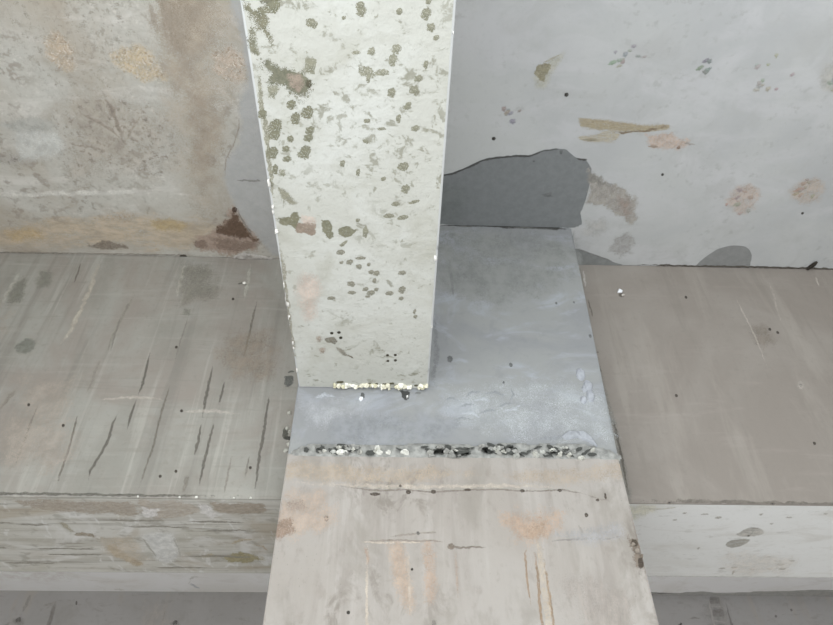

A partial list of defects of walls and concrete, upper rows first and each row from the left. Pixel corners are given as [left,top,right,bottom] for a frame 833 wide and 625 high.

flaking render [440,149,592,235]
crack [0,251,200,282]
flaking render [576,248,622,265]
crack [57,418,77,482]
crack [89,352,151,475]
crack [141,388,169,481]
crack [194,366,225,483]
crack [255,398,270,489]